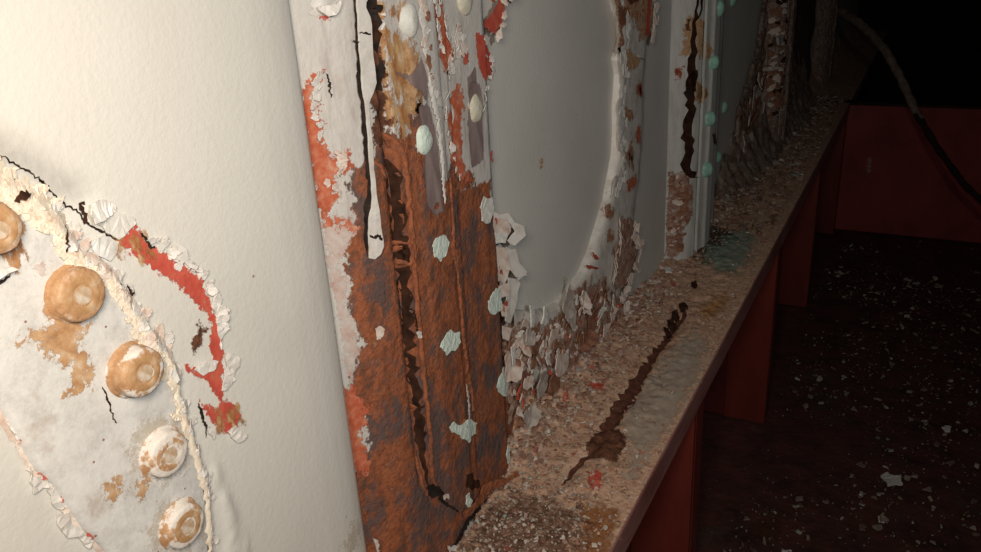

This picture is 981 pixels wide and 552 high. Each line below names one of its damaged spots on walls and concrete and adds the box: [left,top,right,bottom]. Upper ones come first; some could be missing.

peeling [418,0,513,190]
corrosion [615,0,659,72]
crack [680,0,703,178]
corrosion [2,215,28,274]
corrosion [15,305,97,399]
peeling [0,156,247,552]
peeling [302,0,384,480]
crack [353,0,486,552]
corrosion [338,0,645,552]
peeling [493,212,527,341]
corrosion [665,171,694,259]